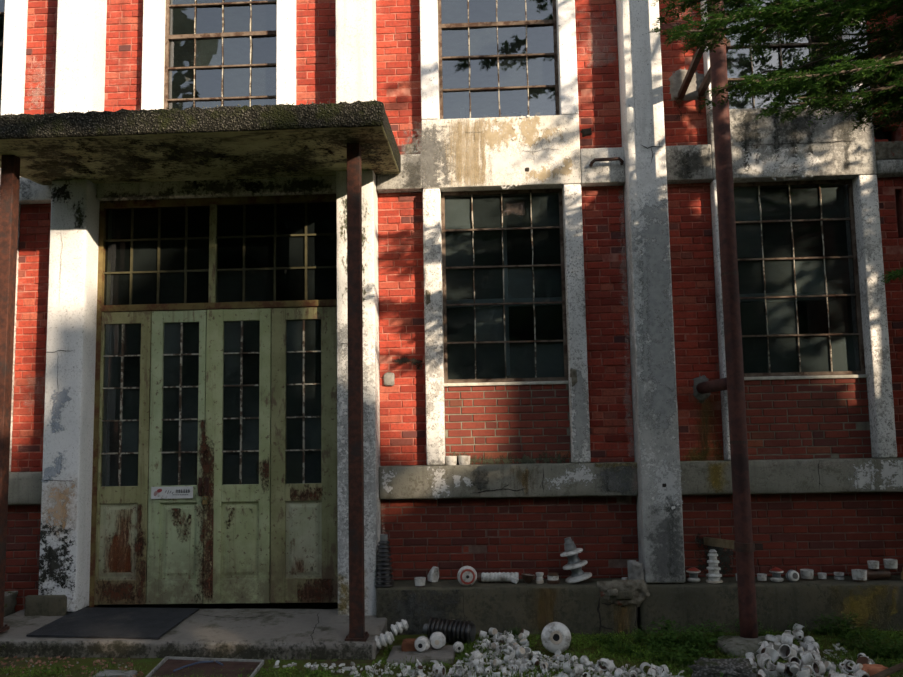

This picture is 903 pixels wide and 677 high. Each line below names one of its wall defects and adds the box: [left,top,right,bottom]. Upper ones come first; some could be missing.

damp [7,128,396,185]
damp [421,118,492,187]
damp [734,108,818,173]
damp [833,111,857,169]
damp [38,485,76,600]
rust [96,504,146,604]
rust [194,420,214,603]
rust [290,484,323,501]